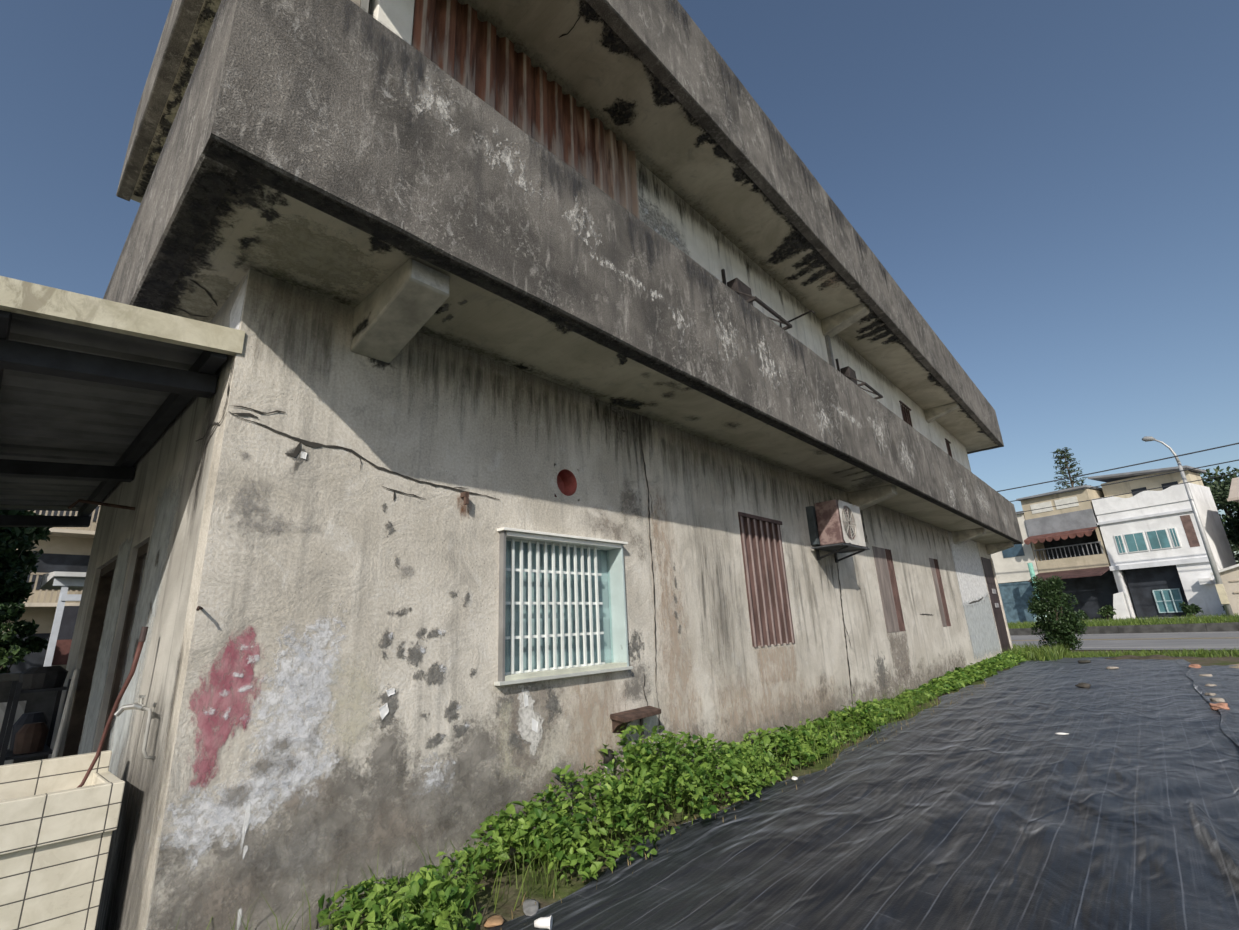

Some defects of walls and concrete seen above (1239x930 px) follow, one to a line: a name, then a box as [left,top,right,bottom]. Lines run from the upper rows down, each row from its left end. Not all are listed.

mould [106,0,225,294]
crack [194,359,500,508]
water stain [135,130,1022,544]
peeling [162,618,345,866]
peeling [377,688,398,728]
spalling [378,628,446,686]
spalling [425,701,469,748]
water stain [98,508,965,930]
crack [639,420,661,757]